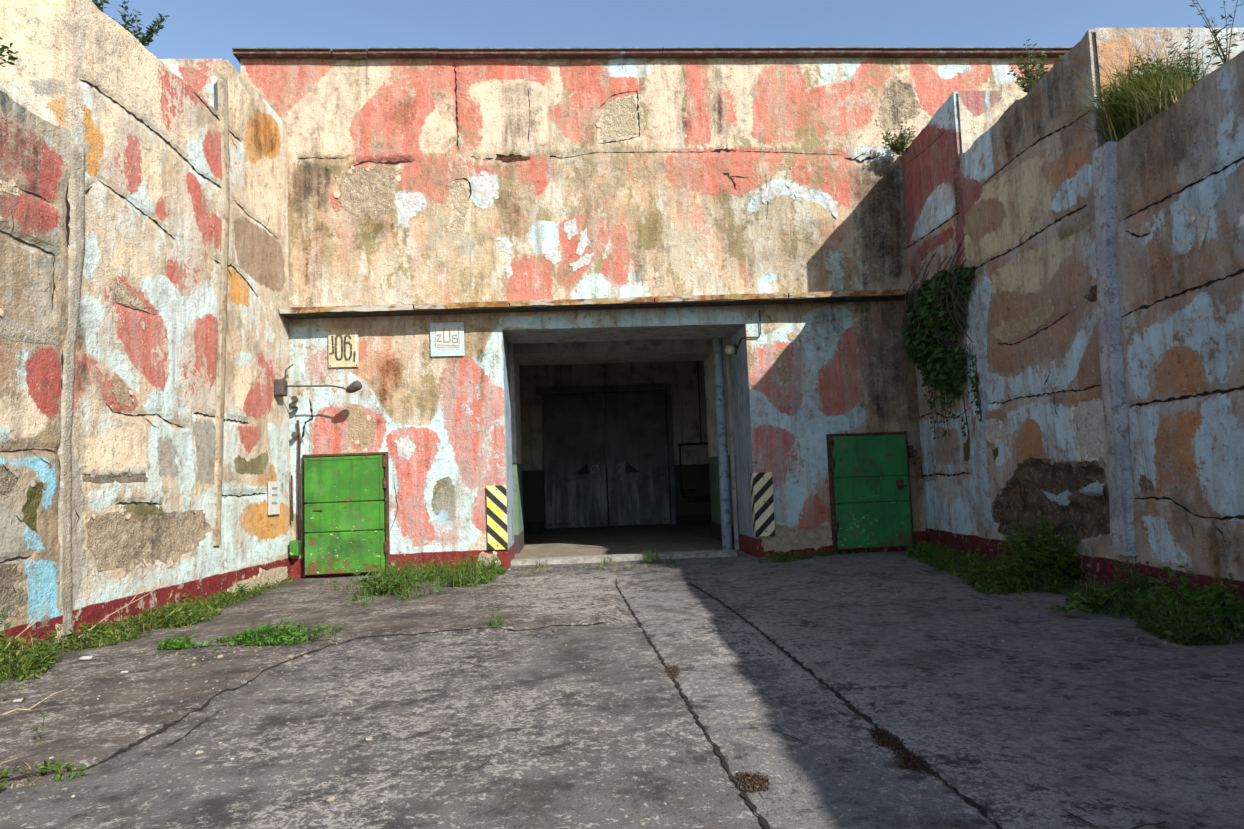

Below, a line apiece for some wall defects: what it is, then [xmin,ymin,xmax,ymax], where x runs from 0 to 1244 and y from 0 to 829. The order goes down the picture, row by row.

spalling [596,96,639,142]
crack [528,90,877,220]
peeling [0,462,47,532]
spalling [85,508,212,573]
spalling [991,398,1110,547]
crack [1134,496,1244,546]
spalling [0,563,28,626]